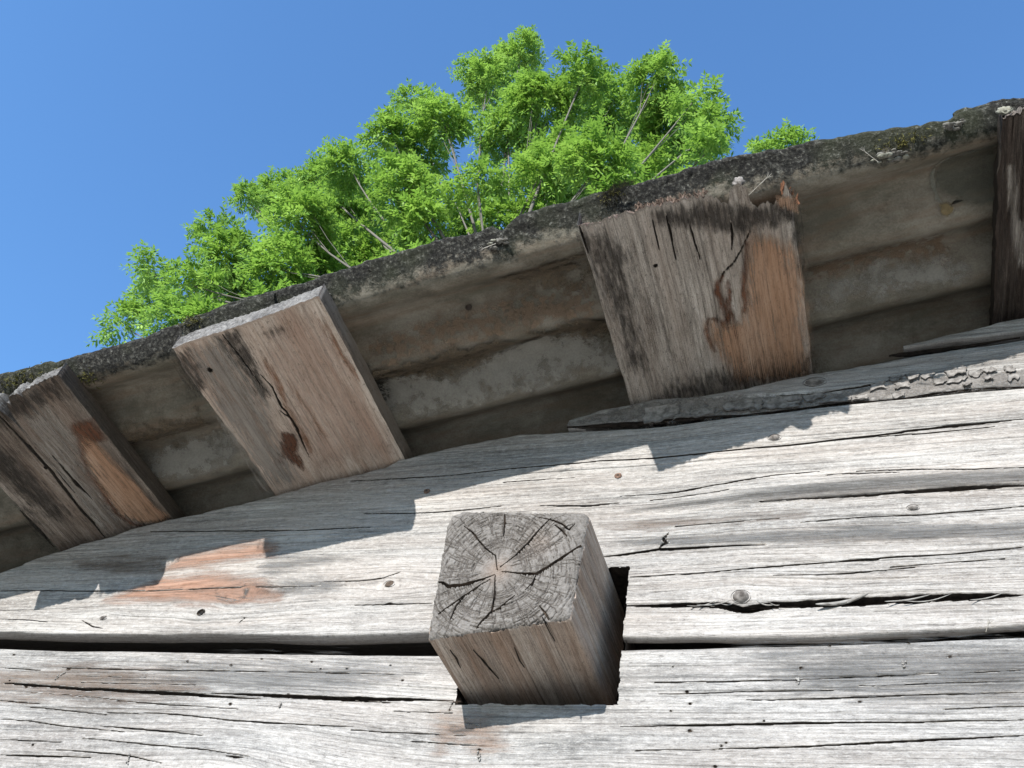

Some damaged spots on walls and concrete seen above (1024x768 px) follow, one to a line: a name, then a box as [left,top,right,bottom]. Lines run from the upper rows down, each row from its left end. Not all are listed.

crack [722,223,749,277]
damp [656,196,968,398]
crack [222,334,309,456]
peeling [762,365,1020,410]
crack [0,377,1024,679]
crack [0,667,485,763]